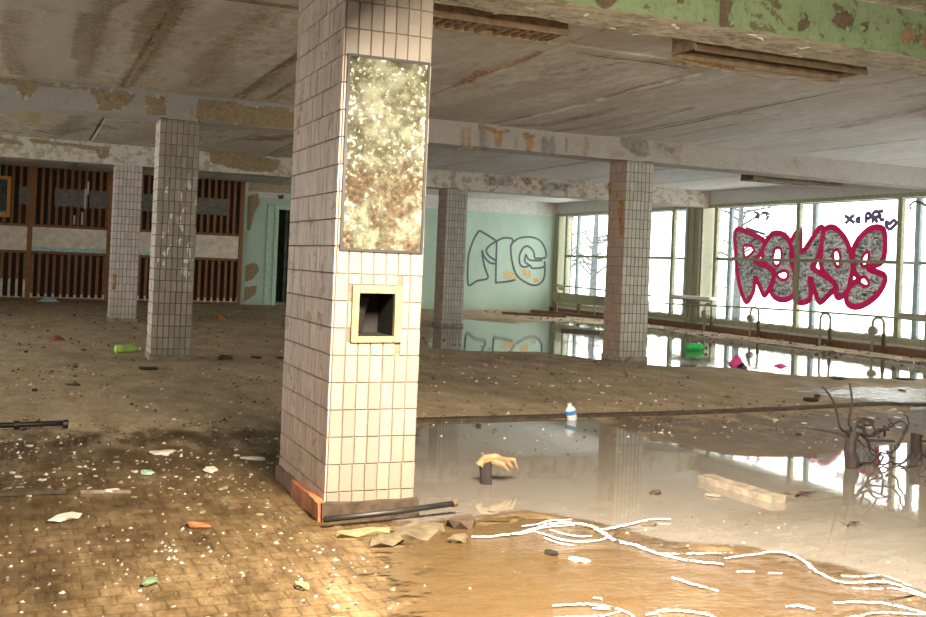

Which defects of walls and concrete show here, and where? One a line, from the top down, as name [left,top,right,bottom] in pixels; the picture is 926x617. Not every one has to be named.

water stain [121,0,191,87]
peeling [469,0,659,36]
peeling [671,0,926,76]
peeling [0,78,167,115]
peeling [196,99,294,129]
water stain [236,54,297,99]
peeling [0,137,110,159]
peeling [244,261,259,302]